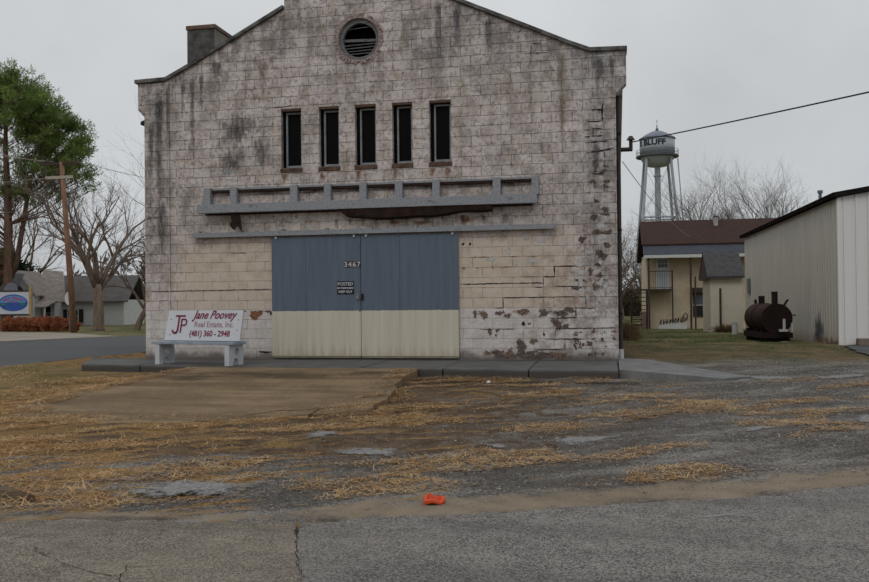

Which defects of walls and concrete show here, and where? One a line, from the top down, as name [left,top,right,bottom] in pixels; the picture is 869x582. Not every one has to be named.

peeling [589,161,610,188]
peeling [571,199,612,299]
spalling [244,310,272,320]
peeling [473,308,616,360]